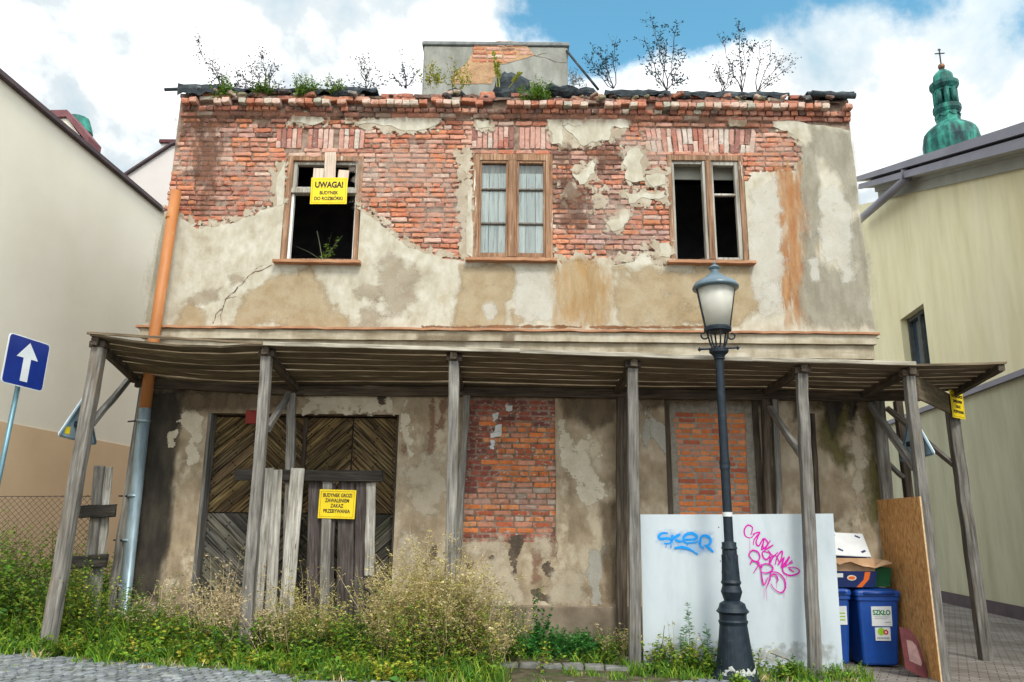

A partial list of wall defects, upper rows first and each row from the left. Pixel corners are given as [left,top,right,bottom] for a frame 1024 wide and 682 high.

flaking render [452,41,534,84]
flaking render [162,111,805,322]
corrosion [775,161,809,319]
crack [213,265,272,324]
peeling [167,410,204,466]
water stain [132,389,287,602]
water stain [531,537,557,584]